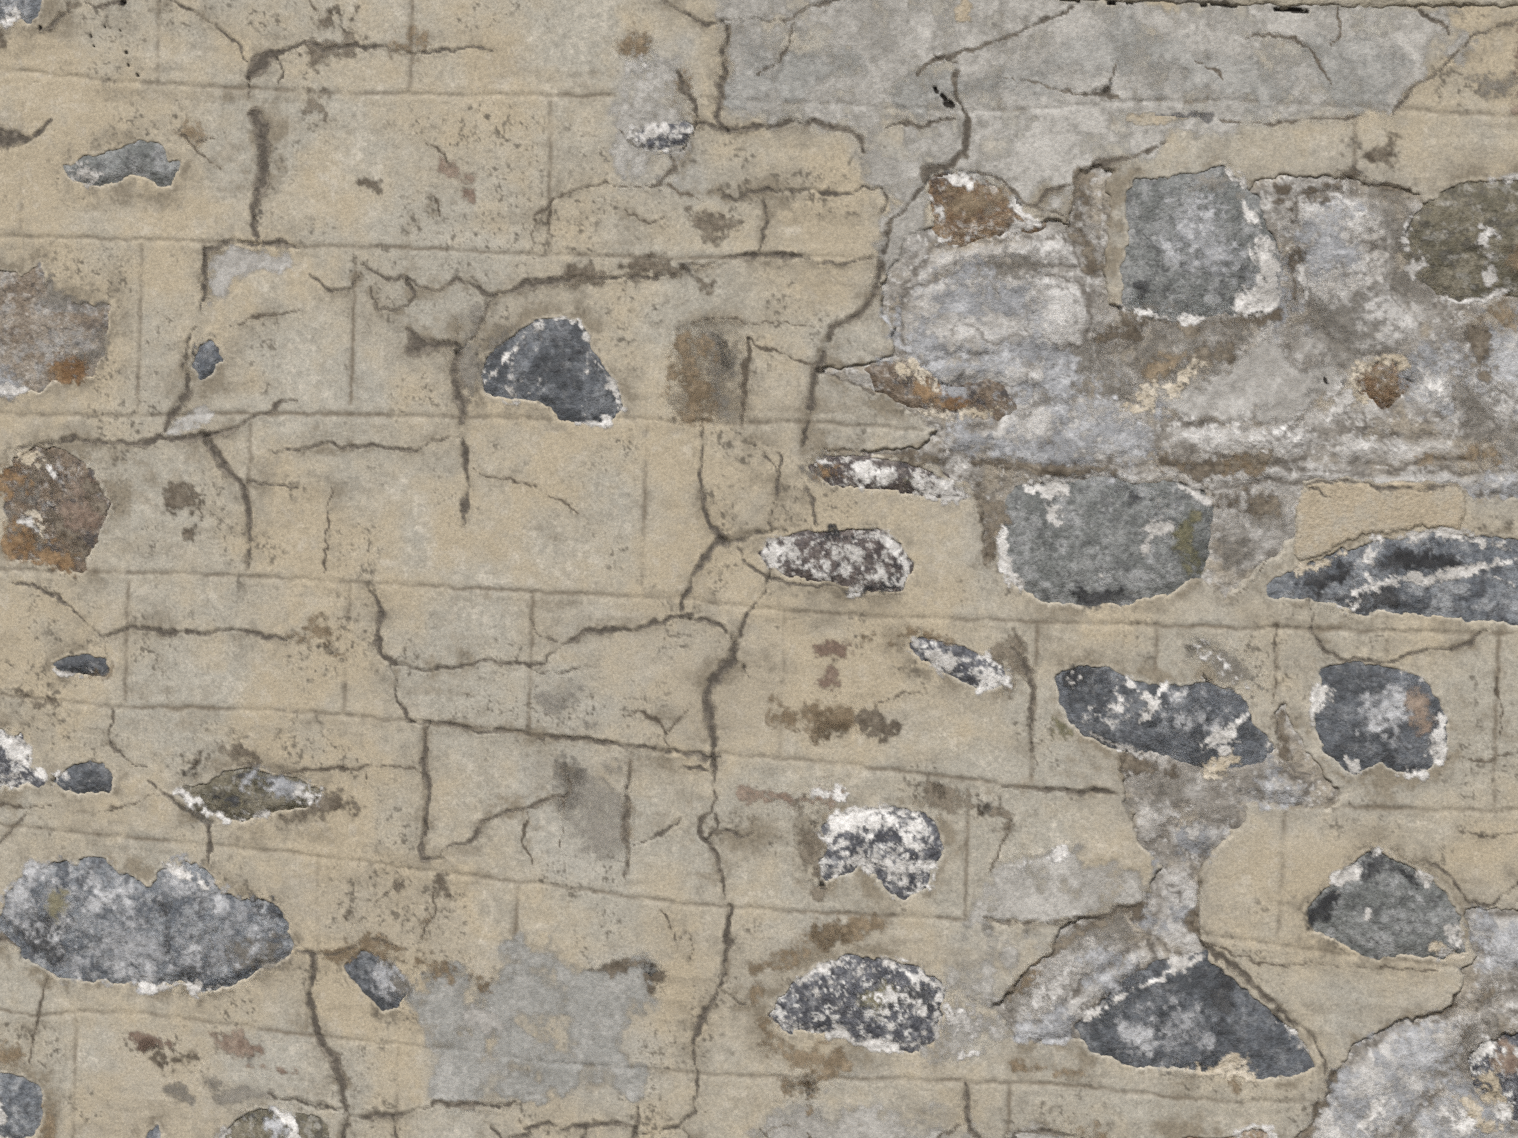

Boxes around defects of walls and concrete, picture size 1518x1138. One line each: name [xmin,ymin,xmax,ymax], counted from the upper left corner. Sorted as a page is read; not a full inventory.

crack [0,118,53,150]
crack [1220,6,1356,126]
spalling [481,316,627,428]
spalling [715,0,1518,608]
spalling [0,446,111,573]
crack [12,0,1165,1138]
crack [1302,479,1452,497]
spalling [1266,526,1518,625]
crack [1273,608,1511,762]
spalling [0,854,294,998]
spalling [749,661,1518,1138]
crack [1198,935,1437,1074]